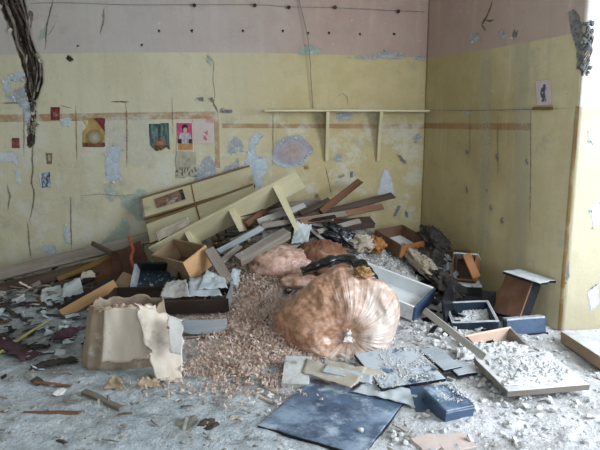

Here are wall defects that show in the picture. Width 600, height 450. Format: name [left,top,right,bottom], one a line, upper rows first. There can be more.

spalling [568,9,595,76]
peeling [2,72,32,123]
crack [0,0,55,258]
peeling [101,135,148,243]
spalling [193,133,314,188]
peeling [376,168,395,196]